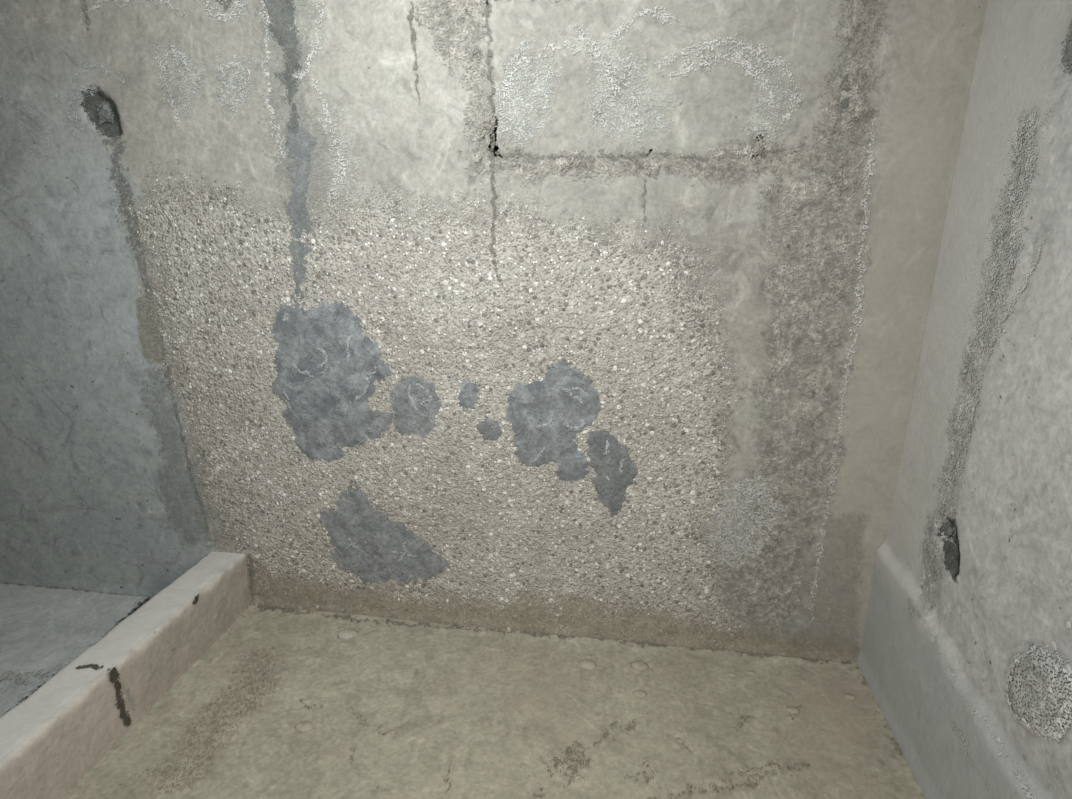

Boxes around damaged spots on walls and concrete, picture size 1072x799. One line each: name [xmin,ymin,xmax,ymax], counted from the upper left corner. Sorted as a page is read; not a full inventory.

leakage [247,0,335,320]
crack [485,1,795,292]
spalling [1057,20,1072,74]
spalling [80,0,897,652]
peeling [905,98,1053,618]
crack [76,664,136,727]